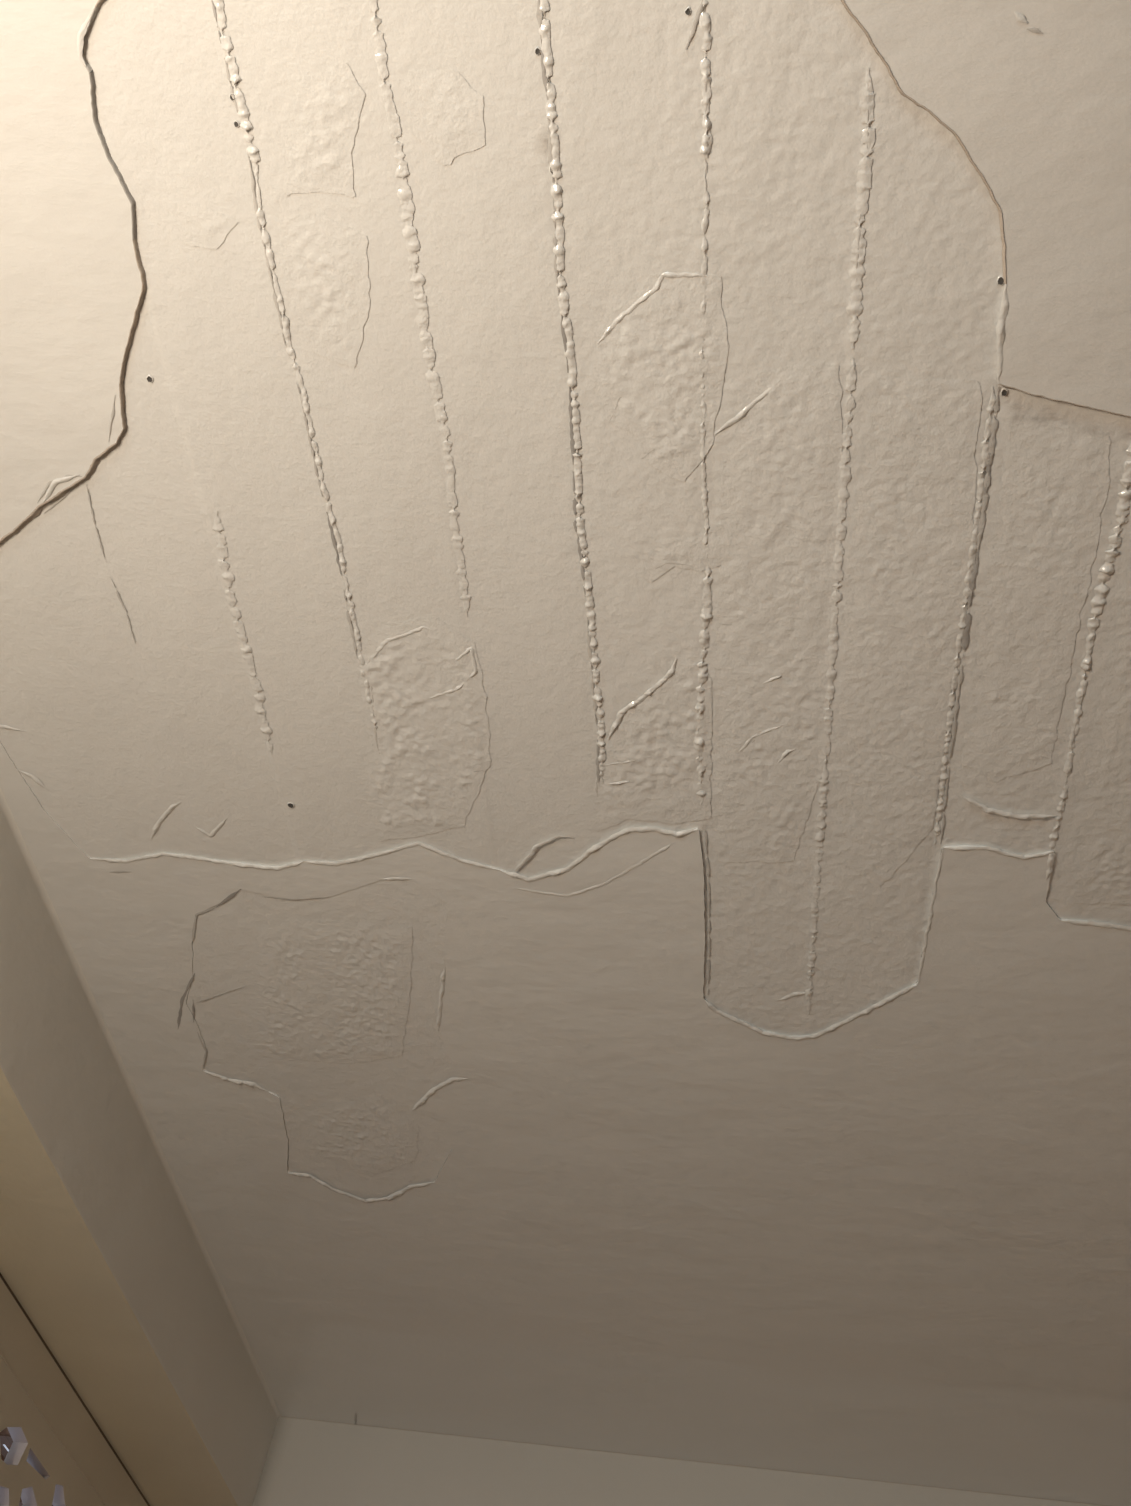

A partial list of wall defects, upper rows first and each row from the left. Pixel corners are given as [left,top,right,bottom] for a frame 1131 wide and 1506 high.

crack [37,474,135,642]
crack [211,0,378,754]
crack [367,0,471,617]
crack [535,0,606,784]
crack [684,0,781,995]
crack [1027,26,1043,34]